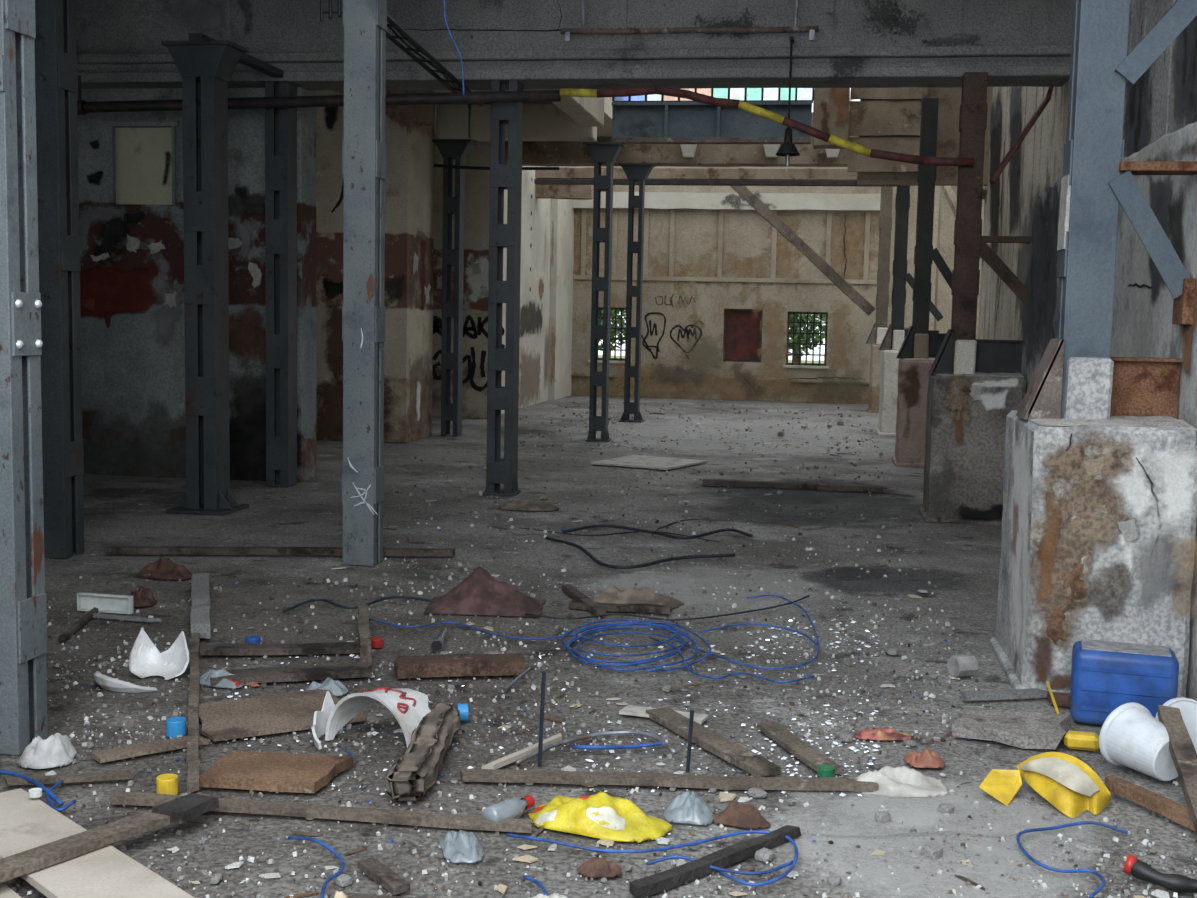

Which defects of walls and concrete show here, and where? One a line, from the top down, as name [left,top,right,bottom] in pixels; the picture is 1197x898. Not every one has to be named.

leakage [864,0,979,47]
leakage [830,57,869,82]
leakage [1172,16,1197,124]
leakage [1124,69,1150,157]
leakage [1149,179,1183,264]
peeling [79,206,184,344]
peeling [410,231,442,310]
peeling [465,254,489,302]
leakage [1149,256,1165,303]
crack [1136,457,1164,543]